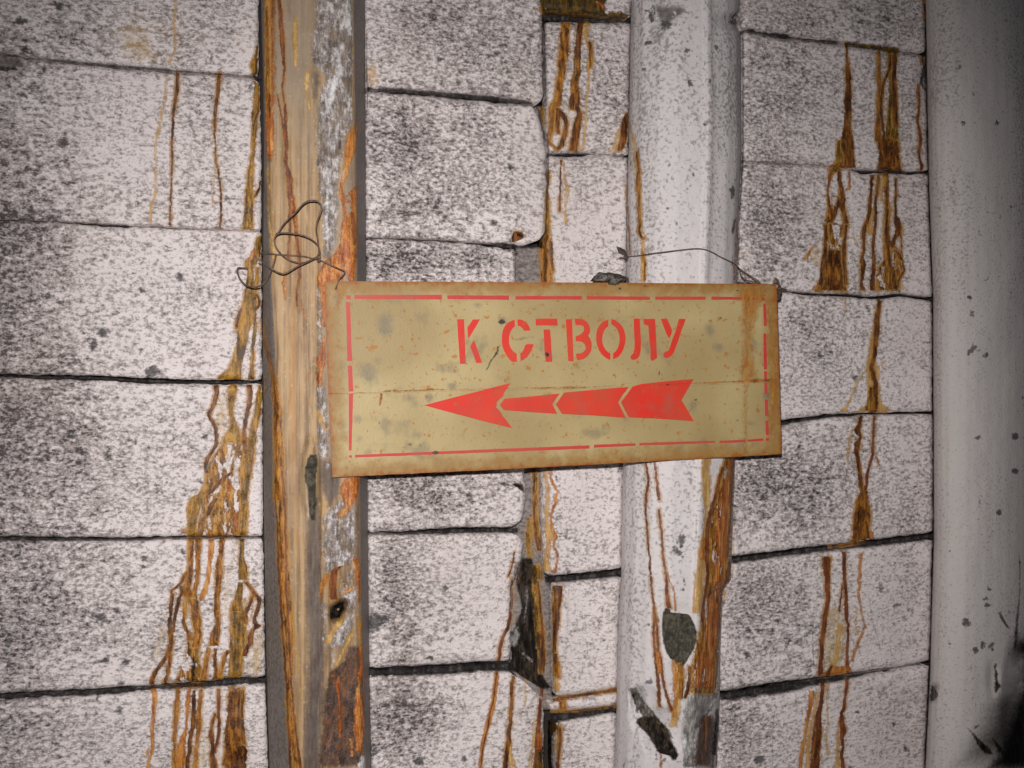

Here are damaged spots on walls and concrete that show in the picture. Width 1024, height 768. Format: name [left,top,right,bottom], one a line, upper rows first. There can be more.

corrosion [538,21,594,282]
corrosion [145,0,310,768]
corrosion [798,42,905,768]
corrosion [478,469,617,768]
spalling [626,680,719,767]
corrosion [644,457,735,727]